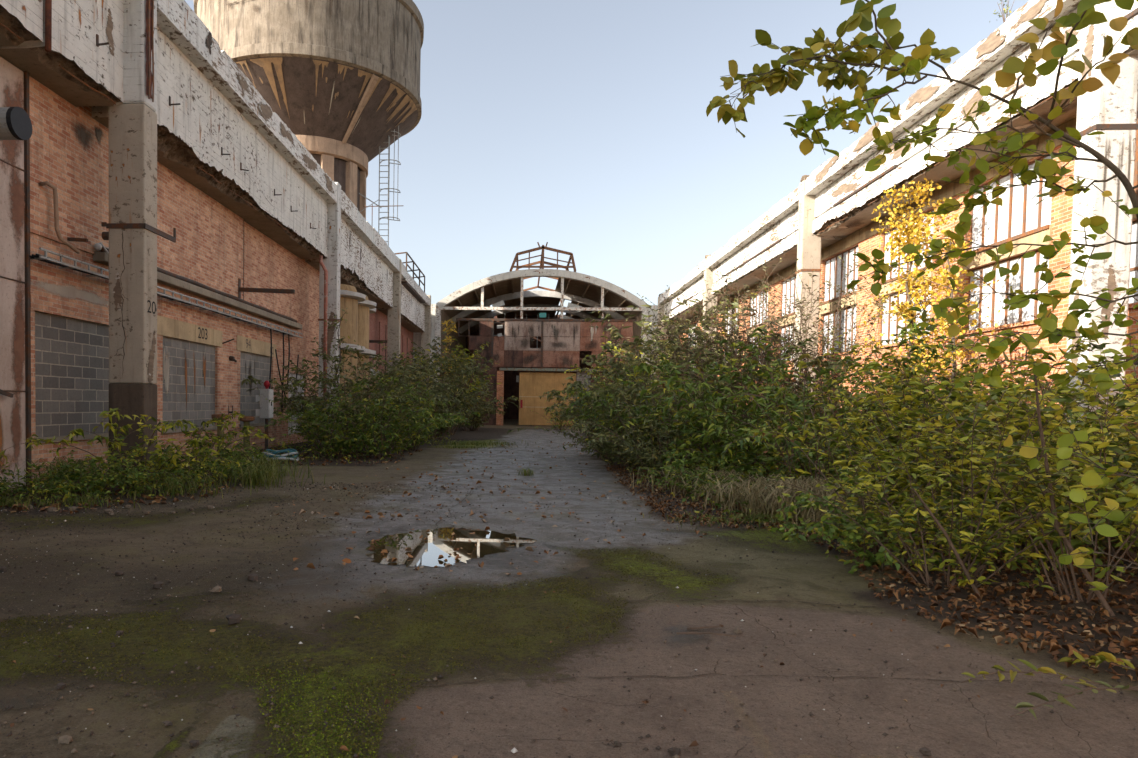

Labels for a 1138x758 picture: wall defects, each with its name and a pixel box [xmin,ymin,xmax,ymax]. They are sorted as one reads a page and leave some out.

corrosion [4,83,24,108]
spalling [0,4,123,106]
peeling [236,57,294,144]
corrosion [0,140,25,241]
peeling [303,155,335,194]
corrosion [0,277,25,472]